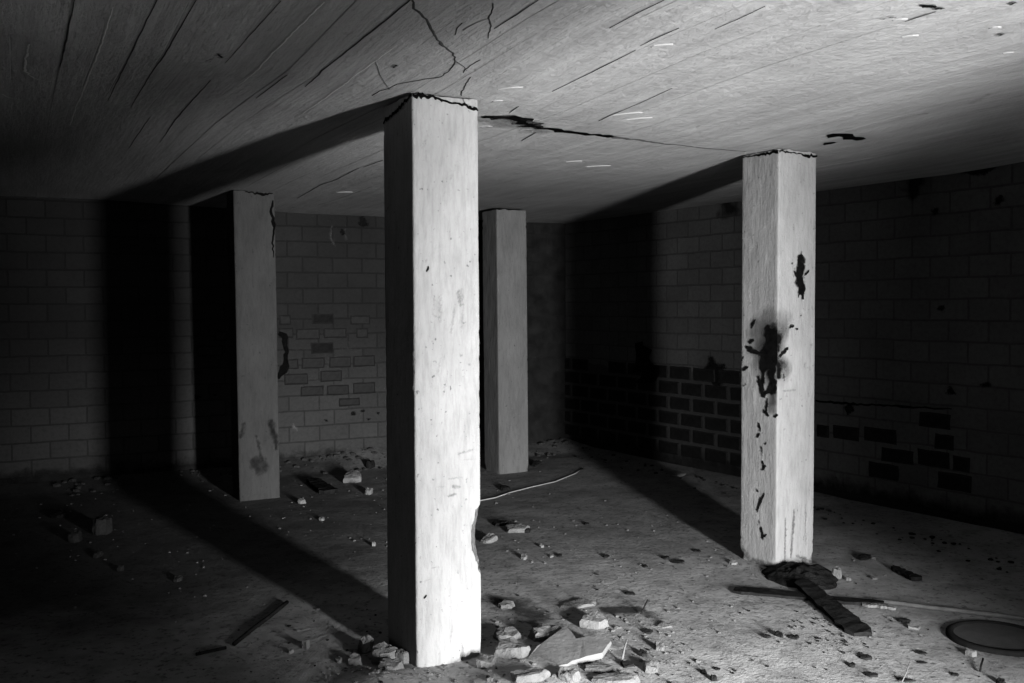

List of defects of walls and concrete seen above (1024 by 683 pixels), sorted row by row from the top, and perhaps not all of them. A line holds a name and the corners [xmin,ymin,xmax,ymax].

crack [256,0,866,158]
crack [245,160,383,257]
peeling [278,314,379,420]
leakage [757,398,778,471]